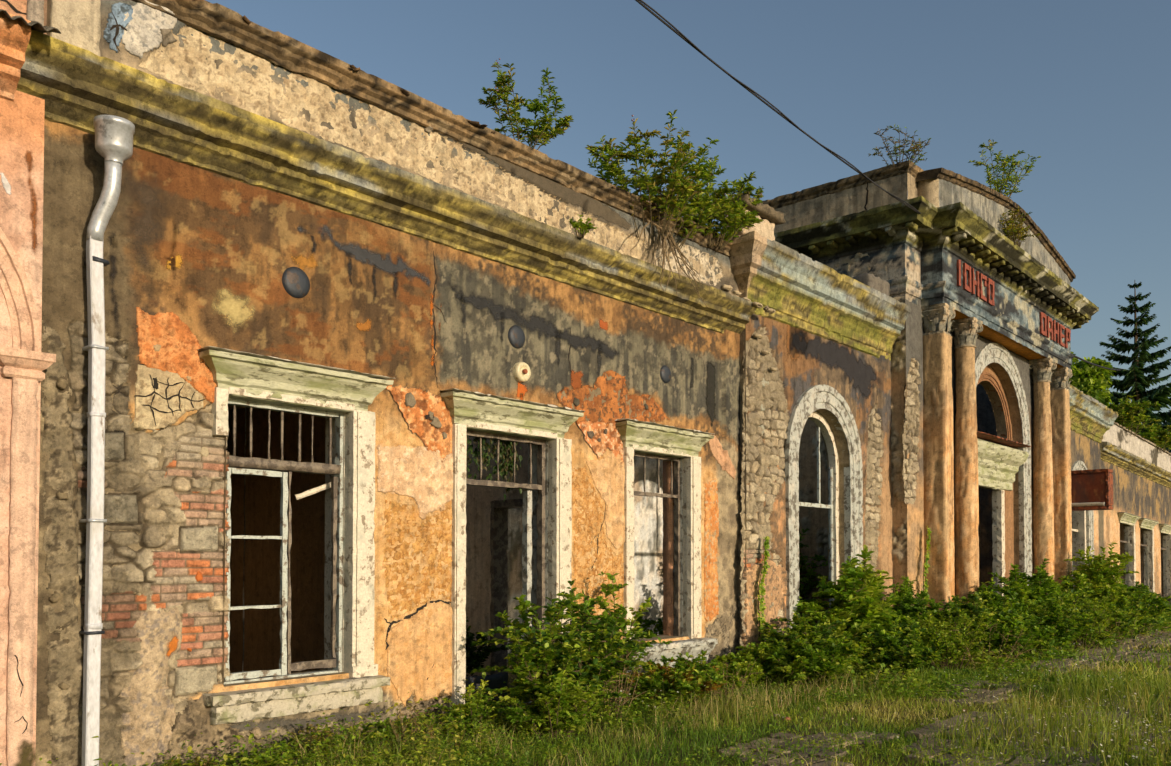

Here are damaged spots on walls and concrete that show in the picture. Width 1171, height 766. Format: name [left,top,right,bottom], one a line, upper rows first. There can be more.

water stain [25,151,37,250]
water stain [127,177,164,271]
water stain [421,125,631,230]
flaking render [40,320,88,766]
water stain [110,233,120,364]
crack [135,374,205,426]
flaking render [99,307,374,766]
flaking render [376,385,453,724]
crack [384,600,451,649]
flaking render [103,0,790,664]
flaking render [864,405,884,574]
flaking render [901,358,921,504]